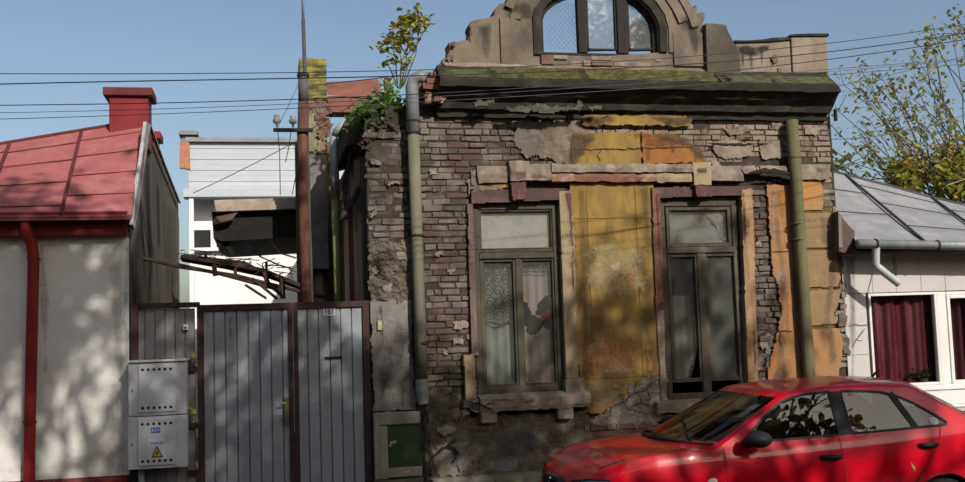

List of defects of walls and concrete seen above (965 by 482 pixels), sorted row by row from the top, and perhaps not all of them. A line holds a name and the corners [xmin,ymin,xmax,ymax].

flaking render [586,120,788,173]
flaking render [798,115,837,234]
flaking render [363,24,602,478]
peeling [566,193,647,296]
flaking render [742,190,781,381]
flaking render [834,254,851,368]
crack [604,380,656,419]